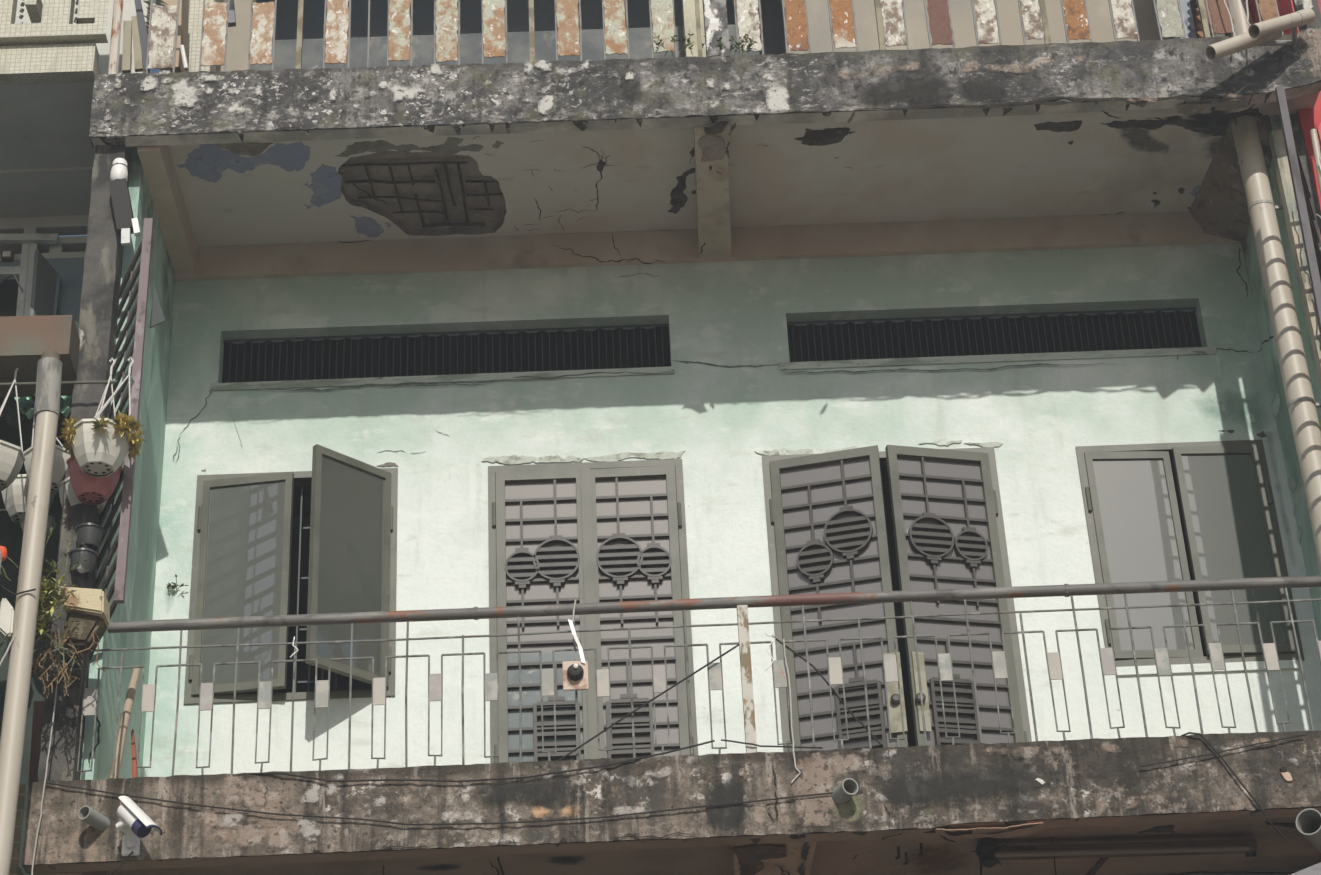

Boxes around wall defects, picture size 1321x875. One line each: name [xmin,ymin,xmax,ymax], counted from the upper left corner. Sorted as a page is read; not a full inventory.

damp [621,74,639,97]
damp [862,76,1003,103]
spalling [668,74,789,214]
spalling [794,127,855,146]
spalling [176,137,507,238]
crack [462,117,669,278]
damp [481,777,576,832]
damp [706,781,745,829]
damp [885,767,1054,807]
spalling [727,834,810,875]